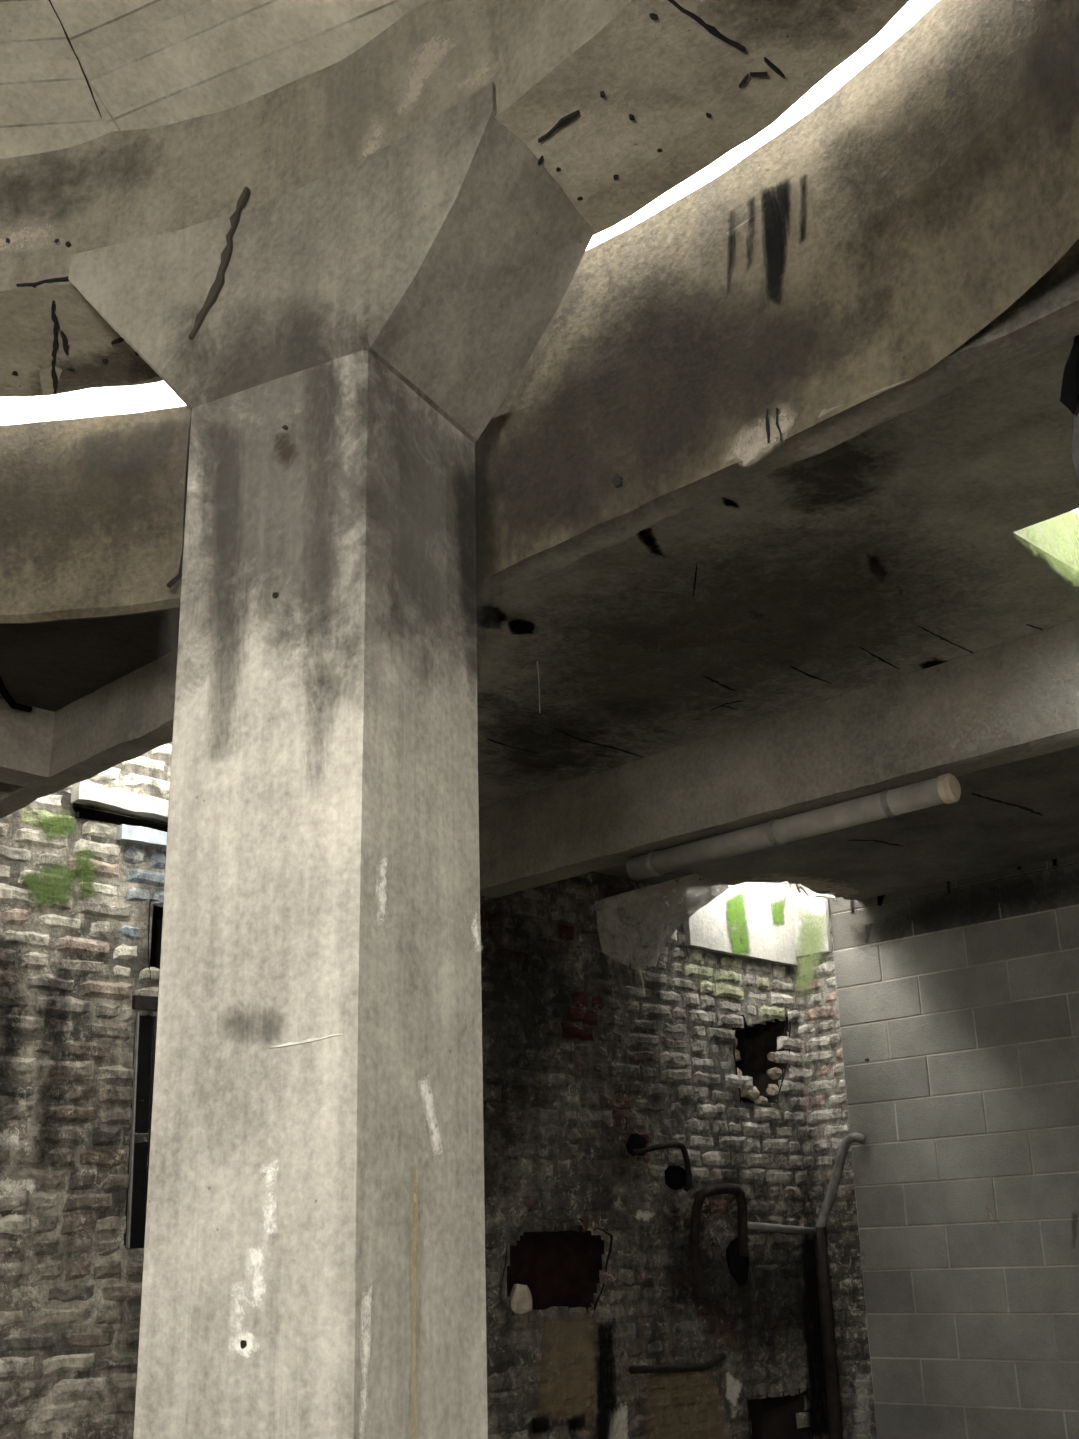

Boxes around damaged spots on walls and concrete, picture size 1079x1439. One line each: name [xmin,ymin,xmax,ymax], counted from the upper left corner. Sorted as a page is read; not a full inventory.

crack [49,0,102,118]
crack [668,0,785,88]
crack [537,110,579,166]
crack [188,187,250,339]
leakage [727,175,807,303]
crack [16,276,69,394]
crack [111,337,125,345]
leakage [784,442,878,511]
leakage [209,433,238,708]
leakage [457,465,481,675]
spalling [732,1015,791,1108]